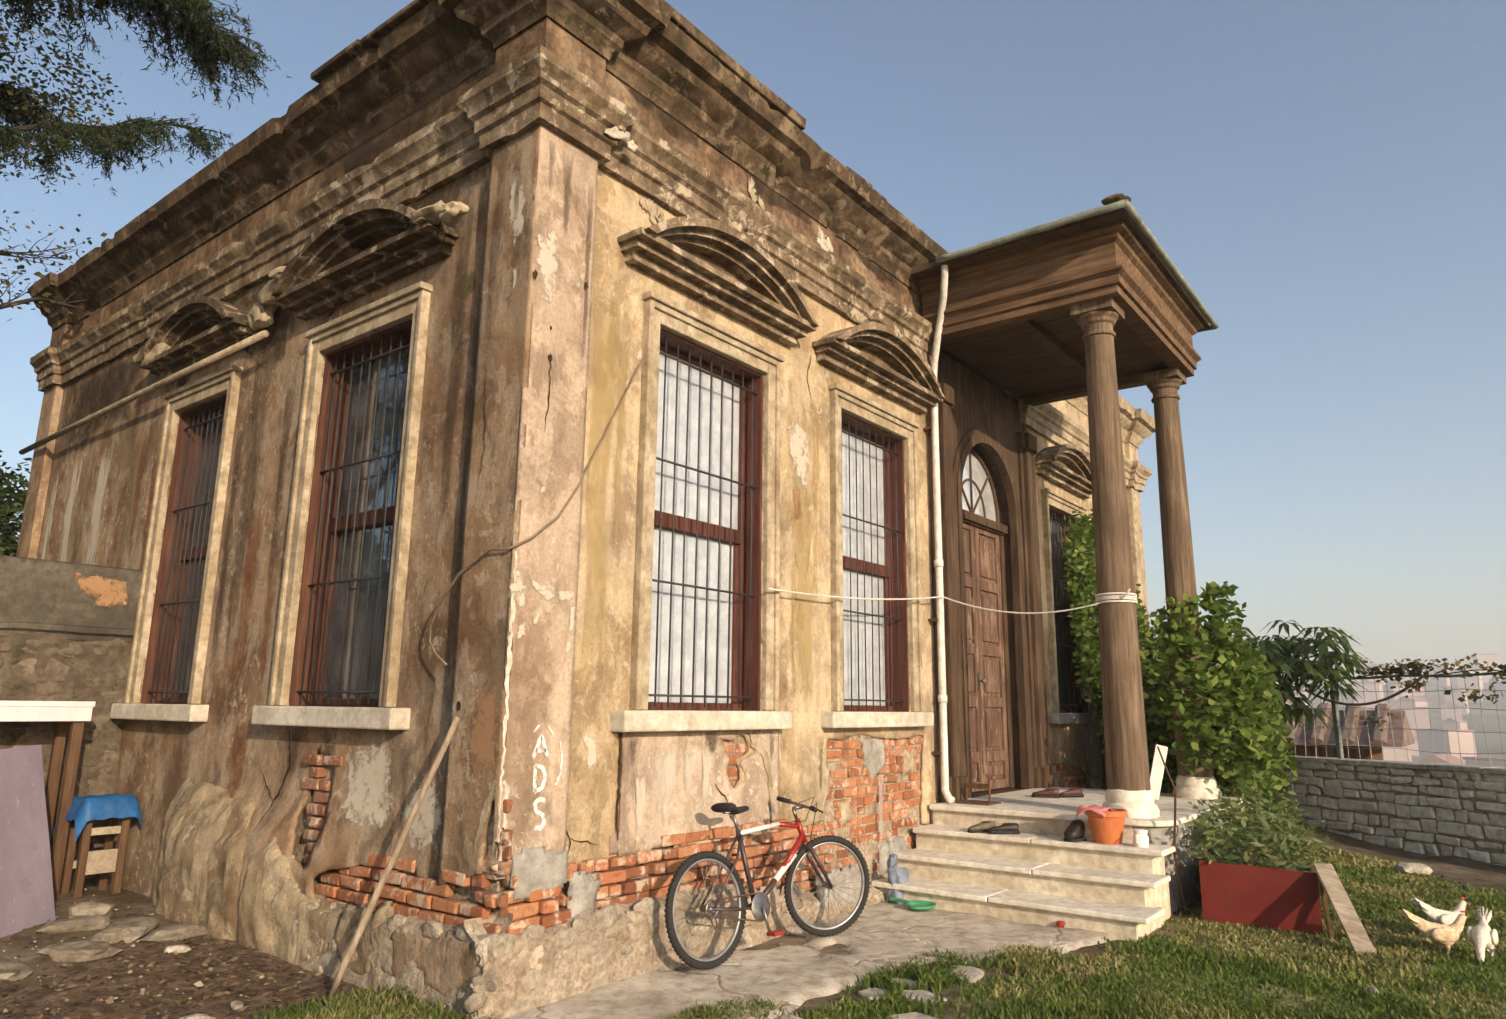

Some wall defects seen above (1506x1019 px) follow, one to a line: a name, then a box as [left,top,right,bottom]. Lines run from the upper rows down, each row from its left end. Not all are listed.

spalling [509,175,558,302]
peeling [789,422,811,518]
spalling [76,573,127,607]
flaking render [300,551,924,936]